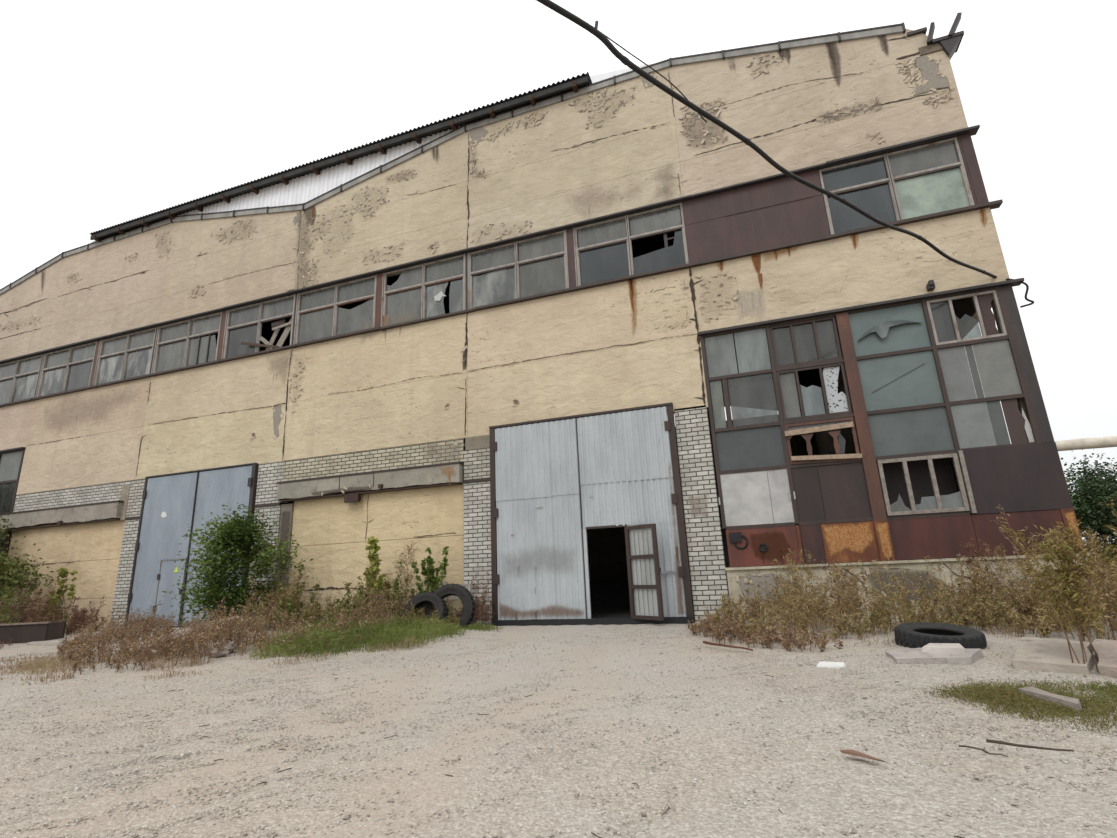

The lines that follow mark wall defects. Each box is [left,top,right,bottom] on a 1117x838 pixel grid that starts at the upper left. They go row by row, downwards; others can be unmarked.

spalling [469,113,545,178]
peeling [569,73,657,129]
peeling [679,98,728,148]
crack [554,72,864,151]
crack [672,87,956,197]
spalling [895,55,956,108]
corrosion [752,254,763,288]
corrosion [751,533,792,563]
corrosion [824,523,892,559]